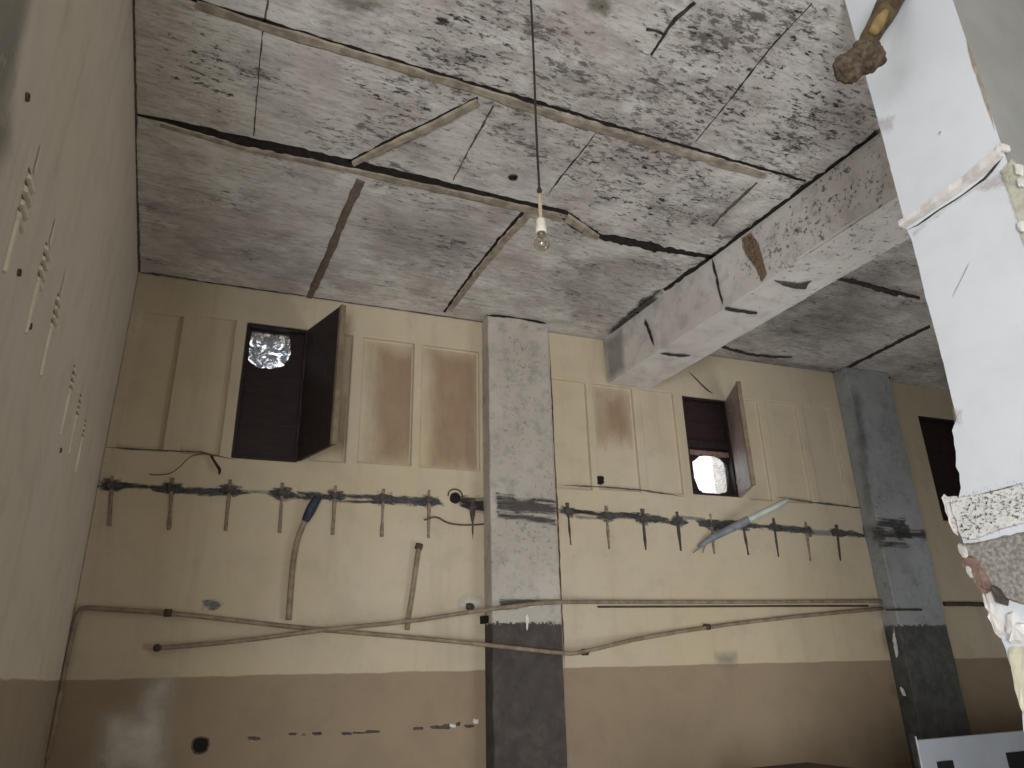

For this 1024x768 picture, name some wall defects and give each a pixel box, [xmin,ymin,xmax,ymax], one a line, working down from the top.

crack [646,1,696,56]
crack [712,259,757,314]
crack [132,0,683,651]
crack [644,319,713,394]
spalling [942,484,1024,714]